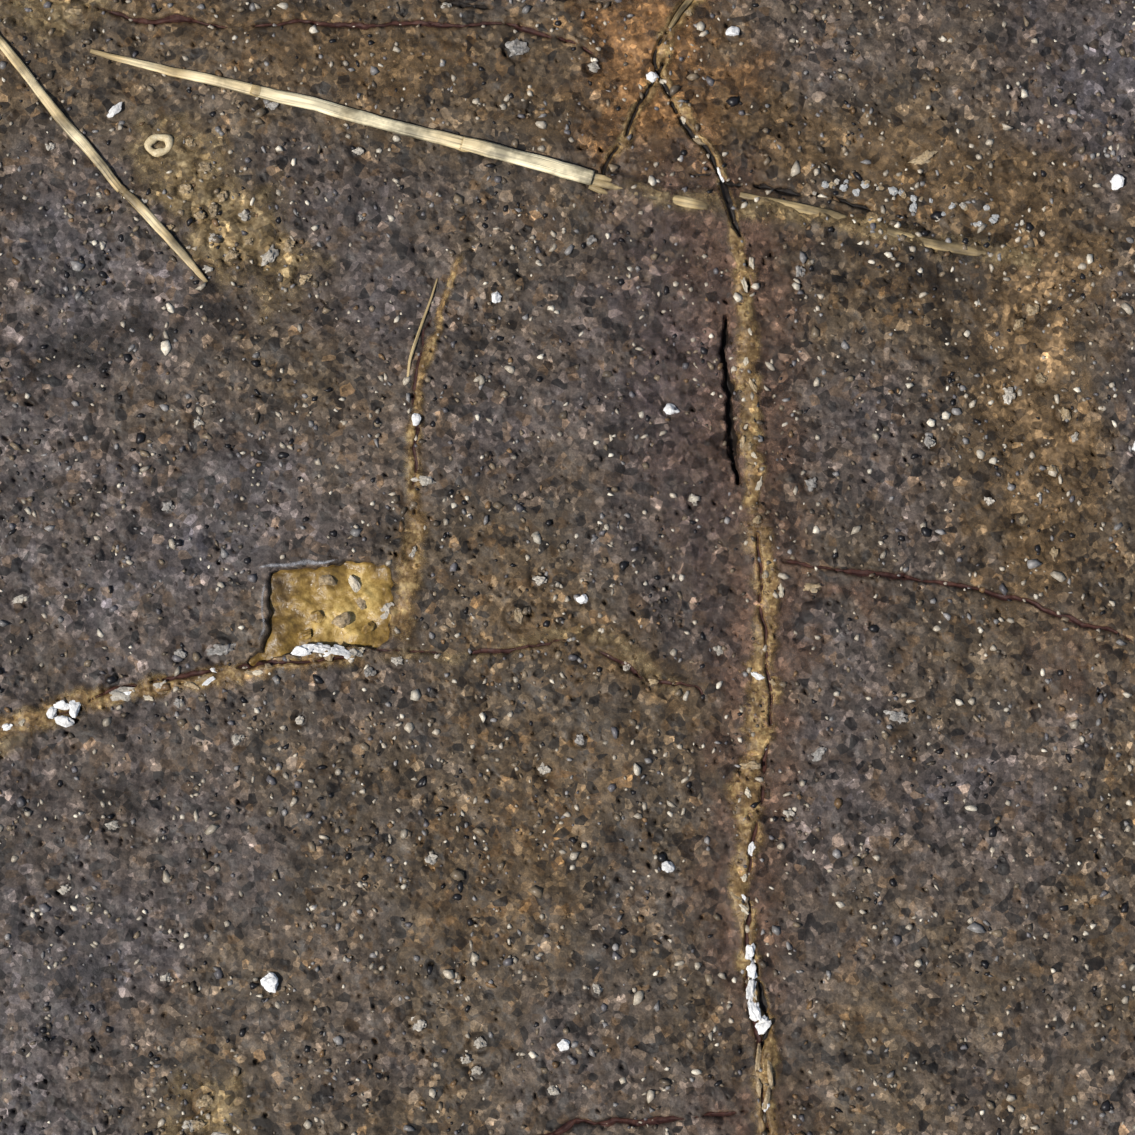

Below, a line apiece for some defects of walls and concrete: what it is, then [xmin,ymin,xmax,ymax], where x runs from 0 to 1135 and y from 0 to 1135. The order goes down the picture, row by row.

spalling [248,560,394,666]
crack [544,0,1132,1135]
crack [0,630,703,739]